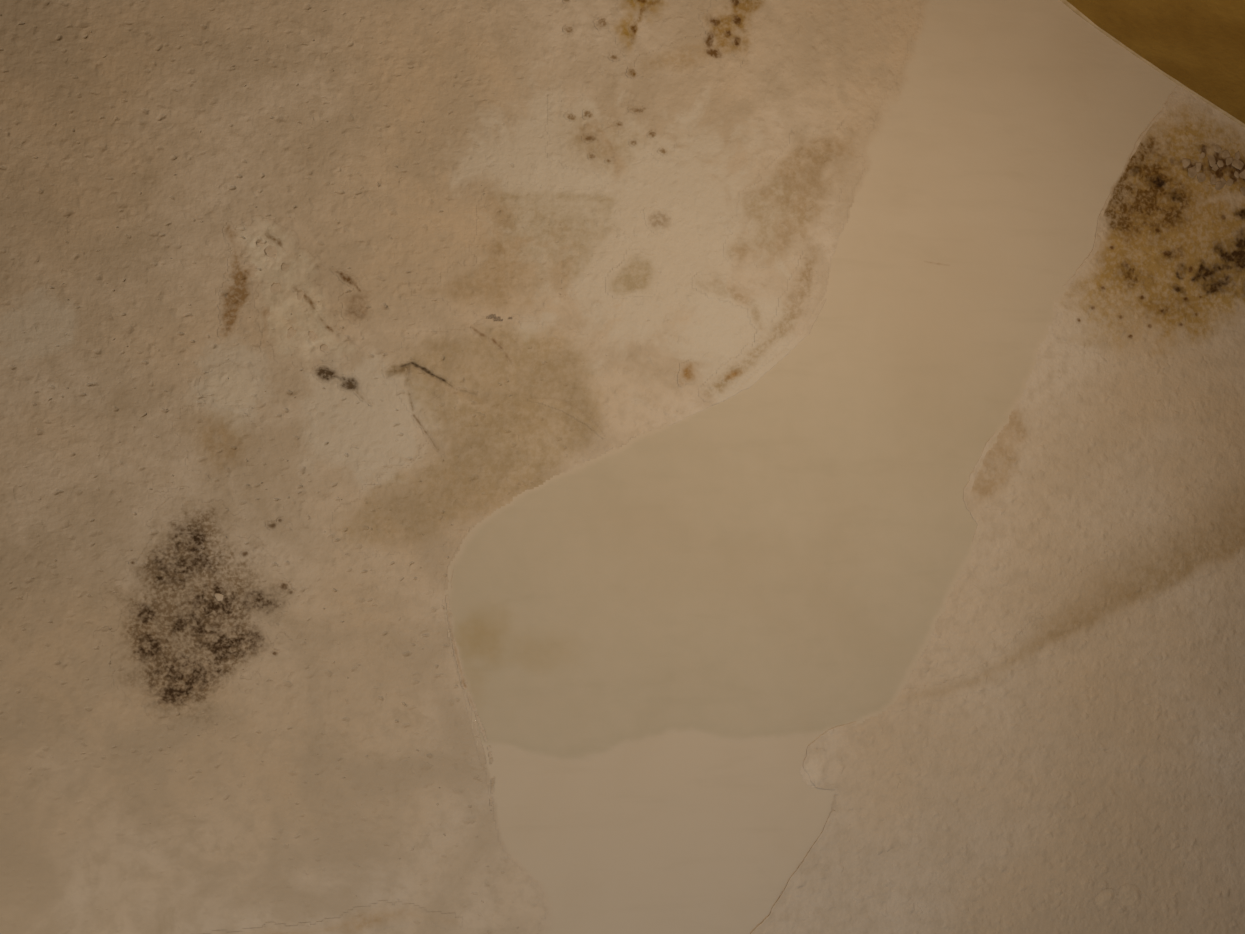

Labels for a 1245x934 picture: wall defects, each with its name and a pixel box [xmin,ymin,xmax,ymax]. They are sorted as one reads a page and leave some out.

mould [1052,98,1245,372]
water stain [172,403,265,478]
water stain [93,483,295,734]